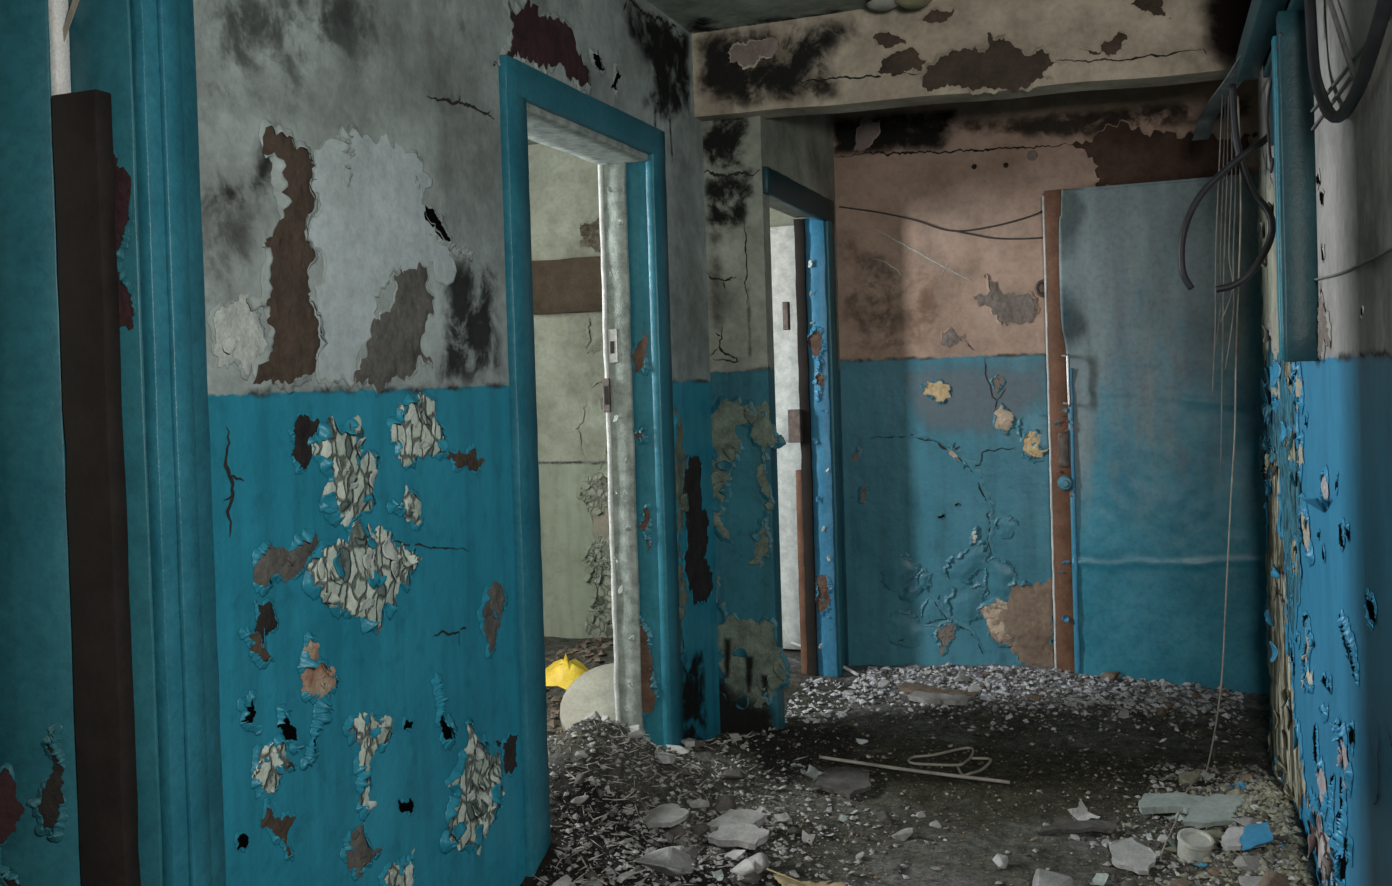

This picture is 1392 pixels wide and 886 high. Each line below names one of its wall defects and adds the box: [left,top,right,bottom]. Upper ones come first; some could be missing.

flaking render [493,0,620,98]
flaking render [873,30,1060,95]
flaking render [974,273,1040,326]
flaking render [207,118,486,670]
crack [967,343,1006,407]
peeling [673,395,790,728]
crack [870,432,1017,578]
flaking render [976,560,1070,667]
peeling [1072,119,1354,886]
peeling [0,722,69,844]
peeling [234,631,415,886]
peeling [431,672,519,855]